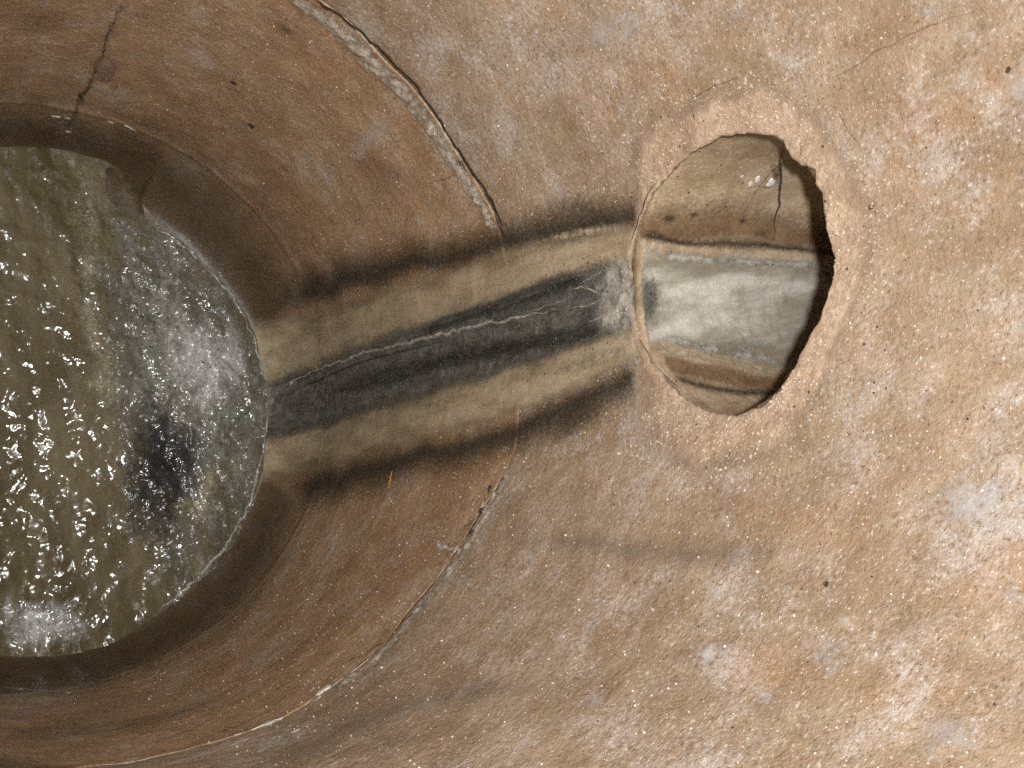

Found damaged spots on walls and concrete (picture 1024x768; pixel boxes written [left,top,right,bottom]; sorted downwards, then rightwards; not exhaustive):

crack [52,6,181,153]
crack [292,0,503,232]
crack [754,150,782,240]